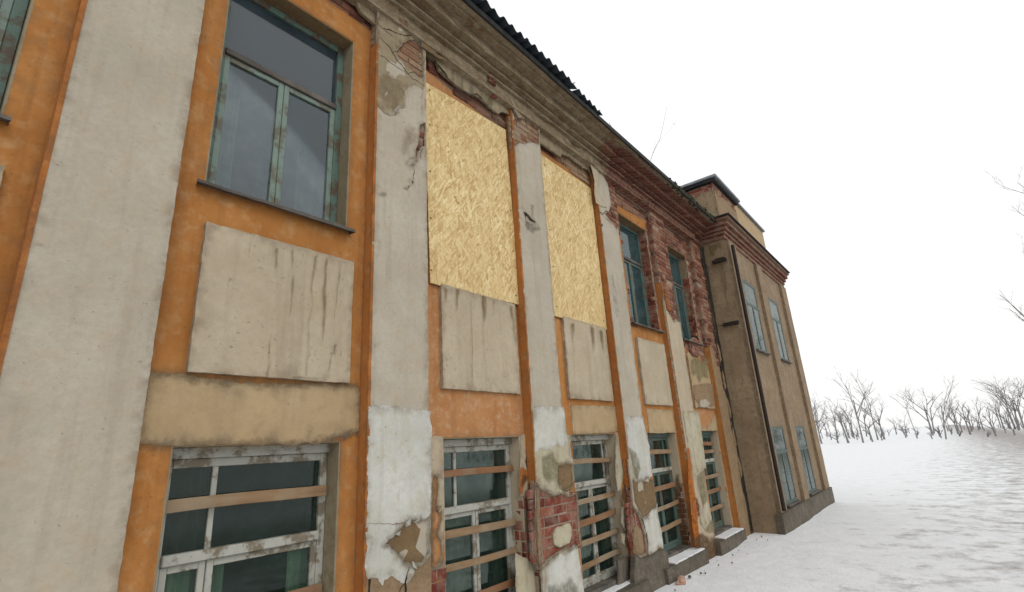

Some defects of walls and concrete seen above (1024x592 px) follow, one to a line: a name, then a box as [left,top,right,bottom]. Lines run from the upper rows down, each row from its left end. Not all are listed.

crack [376,20,496,115]
flaking render [396,41,540,149]
peeling [386,475,447,592]
flaking render [514,463,582,577]
flaking render [616,478,669,592]